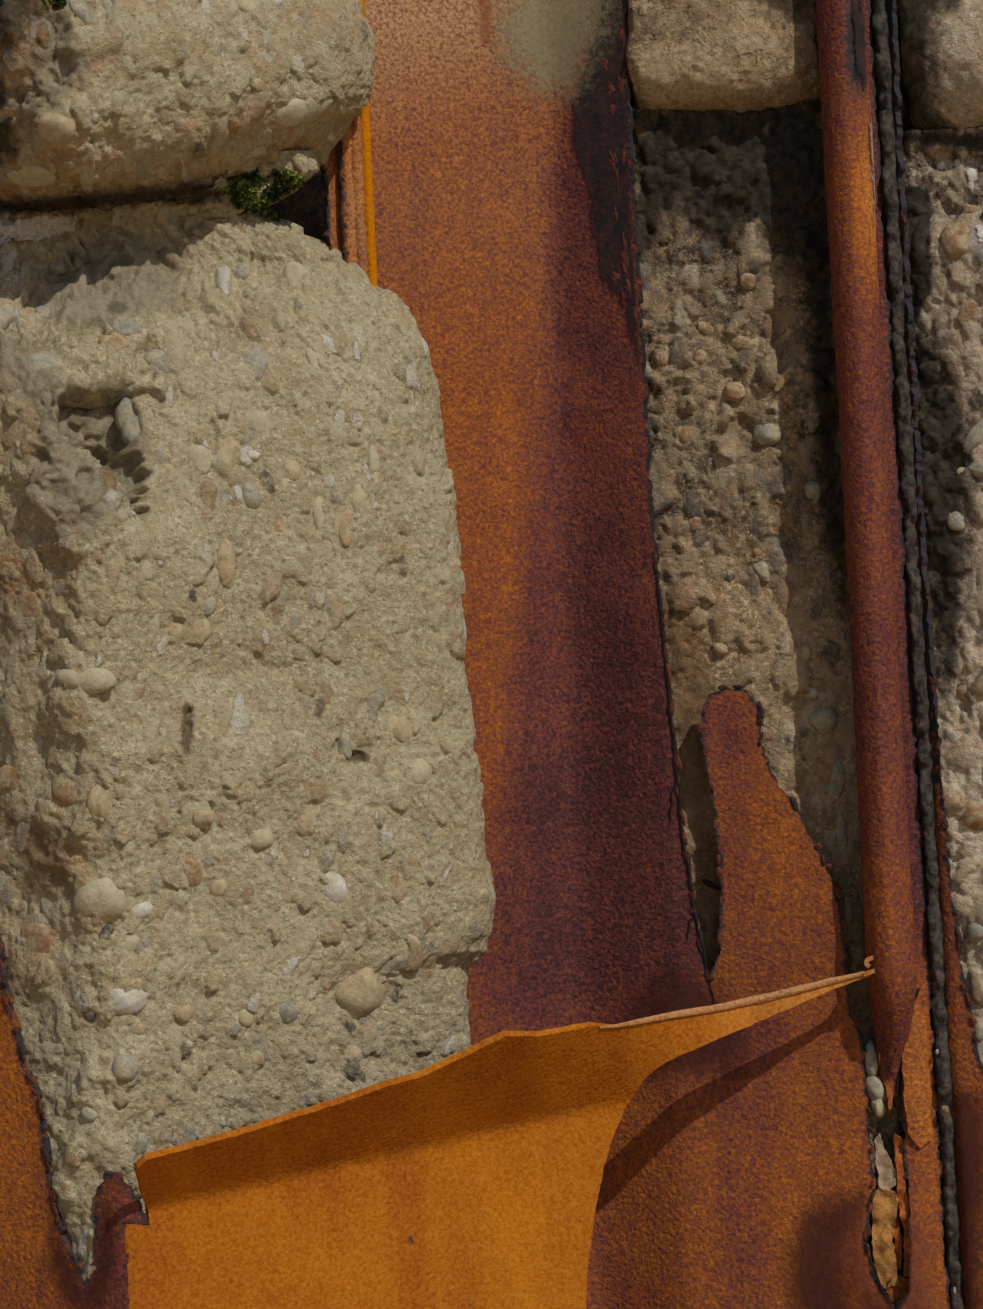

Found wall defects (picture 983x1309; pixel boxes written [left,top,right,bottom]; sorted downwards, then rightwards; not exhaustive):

damp [0,0,47,51]
damp [0,81,18,163]
damp [633,97,848,602]
spalling [182,702,193,754]
spalling [349,751,369,762]
rust [632,972,717,1020]
rust [661,1032,741,1069]
rust [871,1004,933,1306]